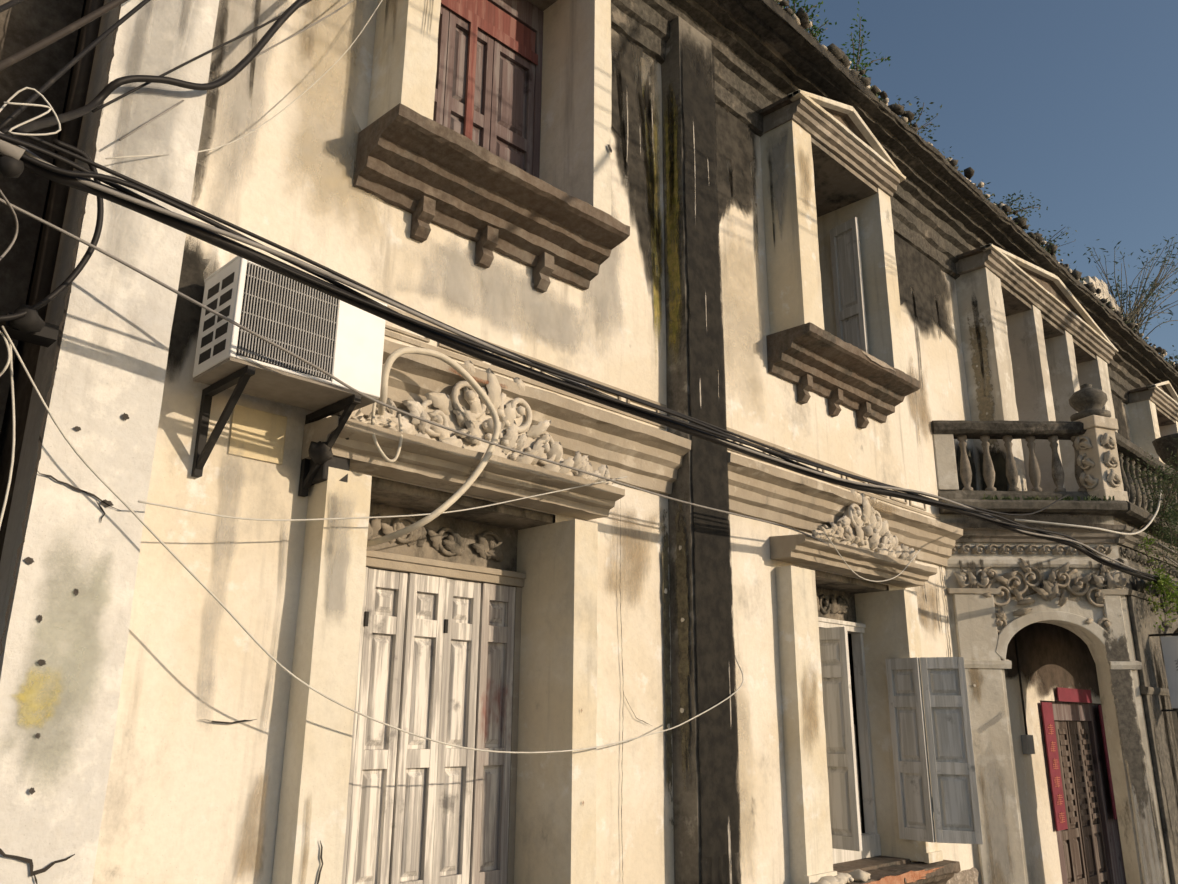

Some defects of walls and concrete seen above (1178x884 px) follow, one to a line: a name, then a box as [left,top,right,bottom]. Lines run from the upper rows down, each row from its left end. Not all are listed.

crack [0,5,121,656]
damp [894,233,958,435]
damp [611,27,786,884]
crack [200,717,257,725]
crack [0,848,75,884]
crack [316,841,324,884]
spalling [866,866,945,884]